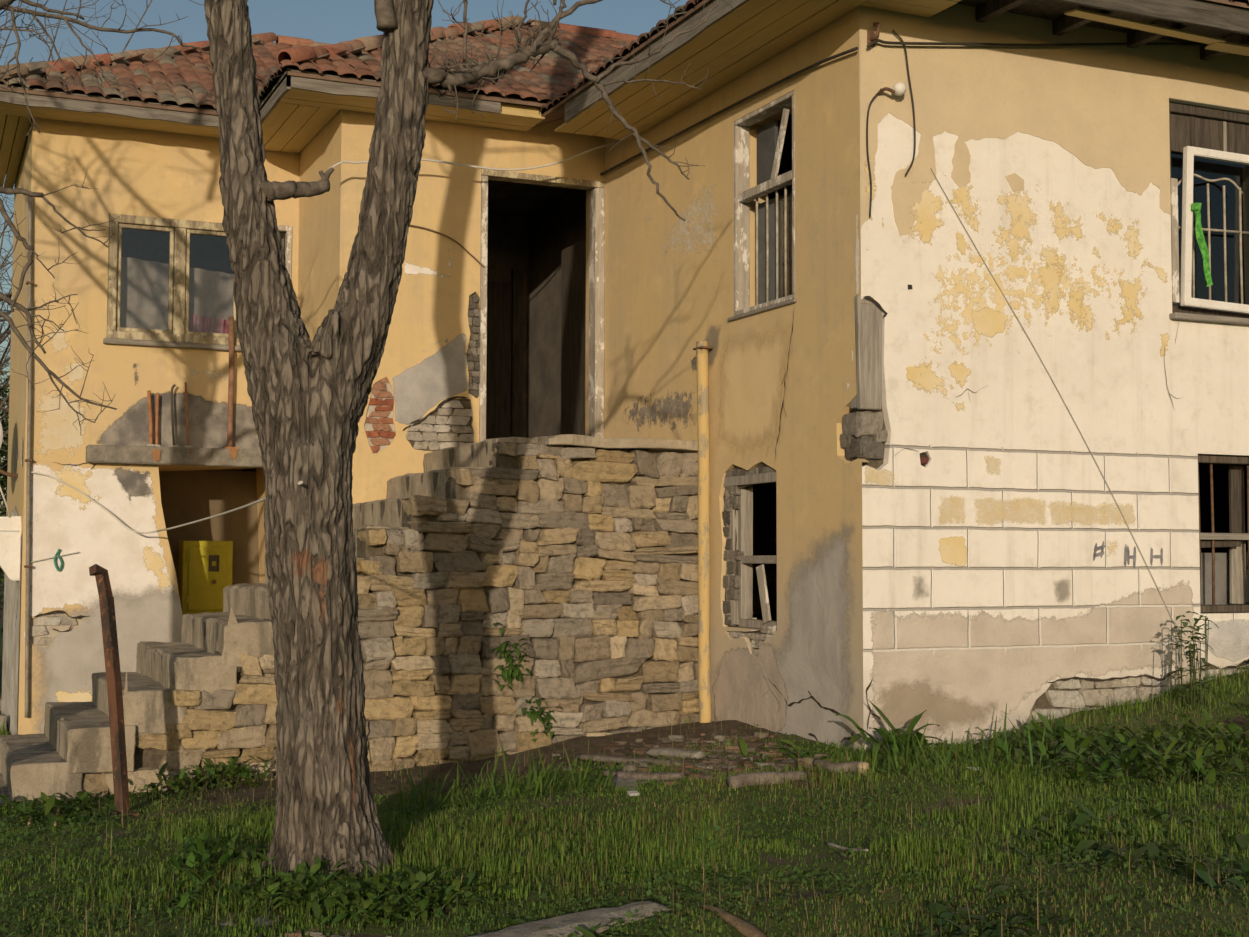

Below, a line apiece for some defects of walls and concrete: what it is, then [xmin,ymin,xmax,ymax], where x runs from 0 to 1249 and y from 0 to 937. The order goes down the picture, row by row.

peeling [839,3,1249,485]
spalling [364,292,480,455]
leakage [625,391,693,431]
peeling [1,362,183,735]
flaking render [712,463,852,750]
crack [762,675,881,743]
peeling [939,497,1135,566]
peeling [871,580,1249,747]